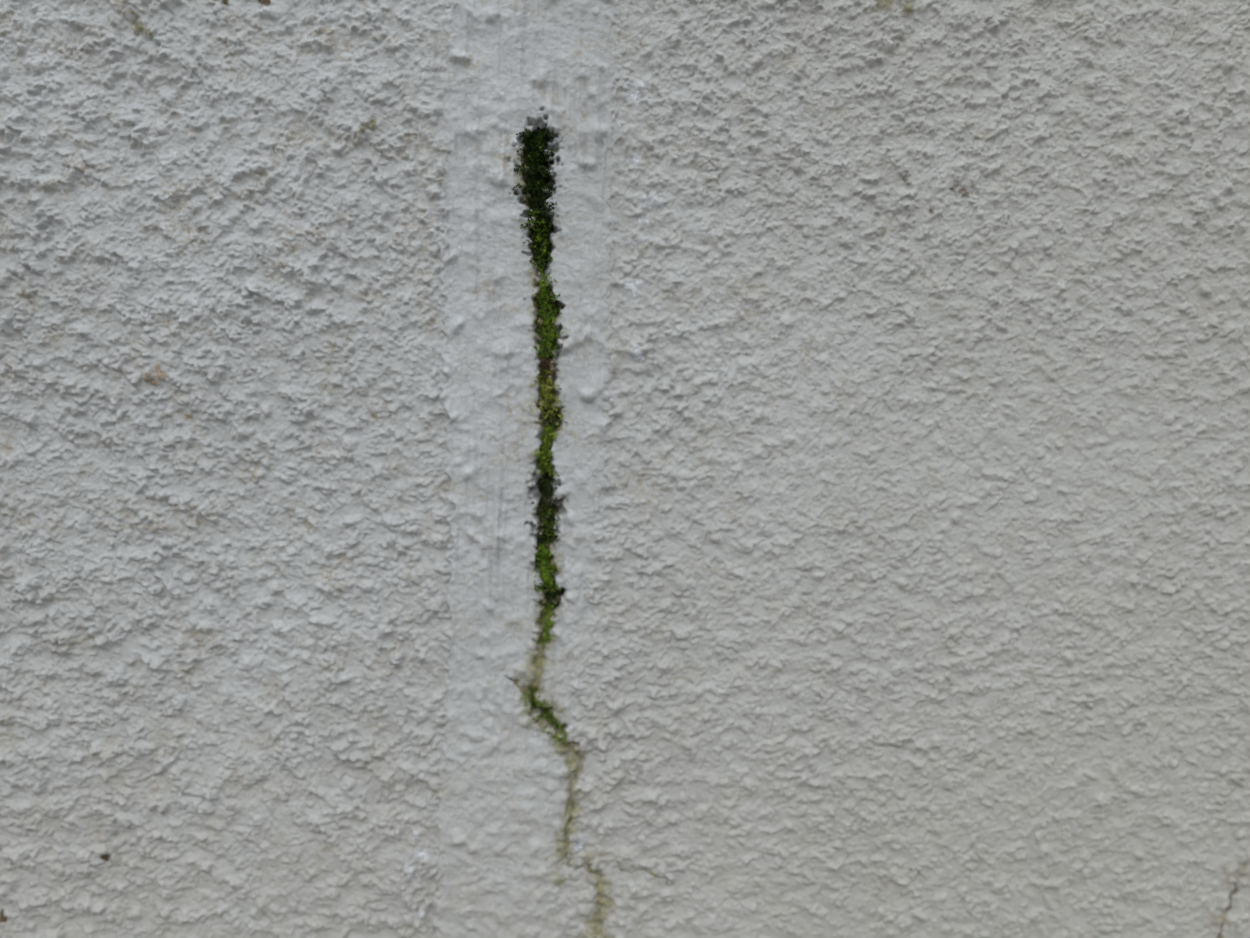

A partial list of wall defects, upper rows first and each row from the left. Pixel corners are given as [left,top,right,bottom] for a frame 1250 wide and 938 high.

crack [506,126,577,810]
crack [566,846,674,934]